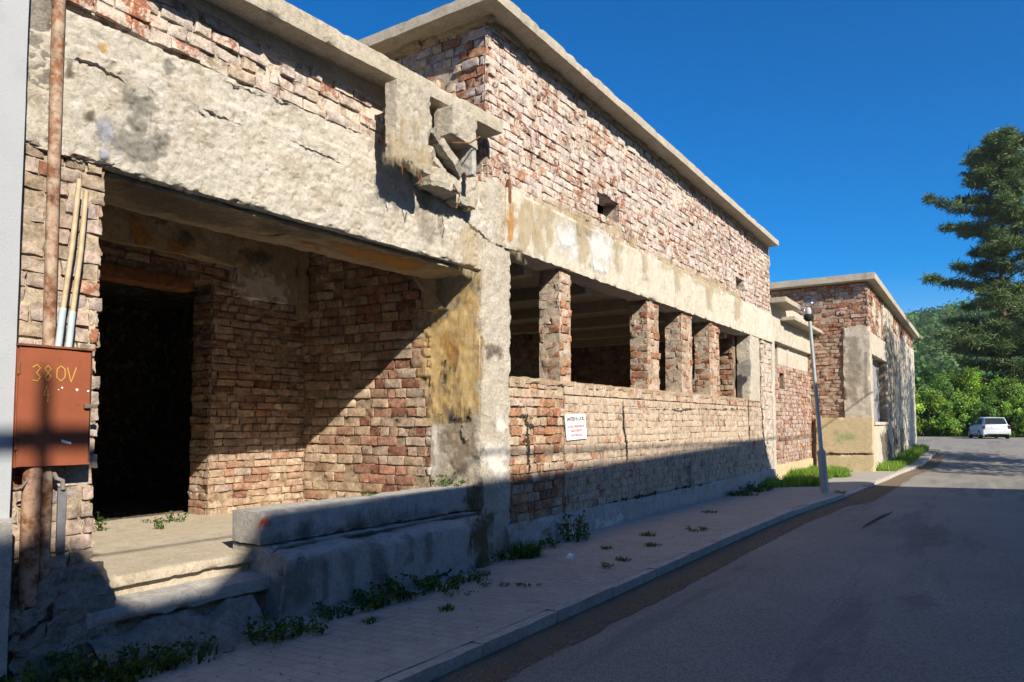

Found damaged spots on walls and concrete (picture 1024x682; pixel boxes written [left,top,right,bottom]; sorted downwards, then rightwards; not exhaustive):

crack [69,57,241,125]
crack [220,78,350,167]
spalling [428,127,480,209]
corrosion [506,205,515,241]
crack [437,409,534,474]